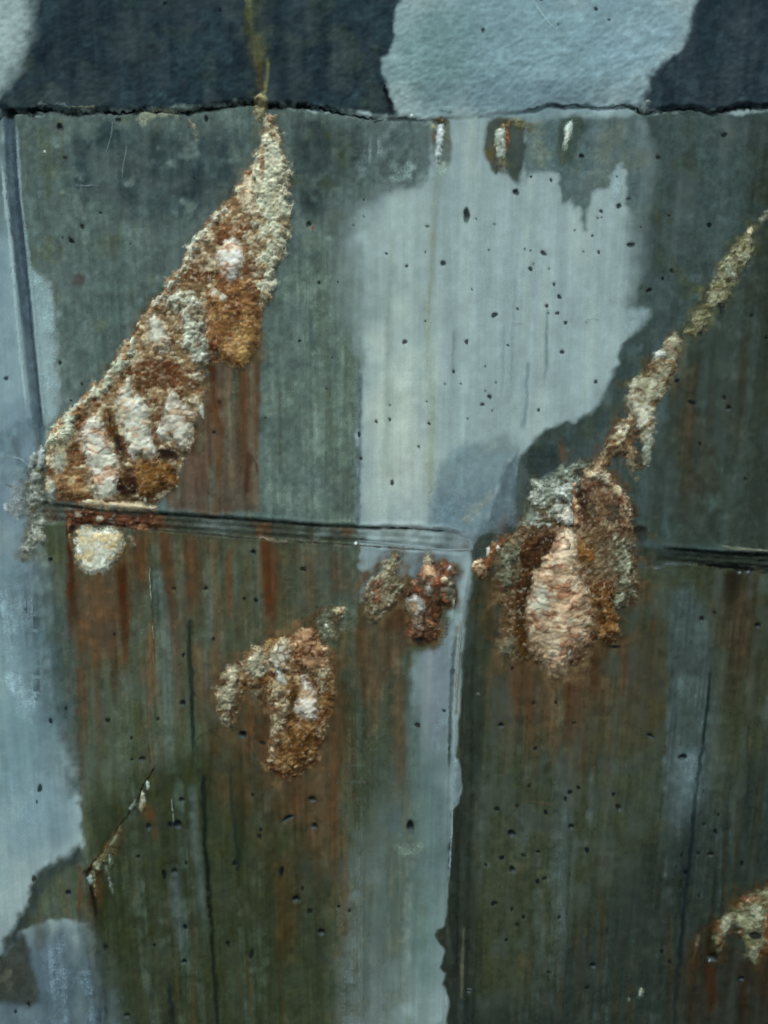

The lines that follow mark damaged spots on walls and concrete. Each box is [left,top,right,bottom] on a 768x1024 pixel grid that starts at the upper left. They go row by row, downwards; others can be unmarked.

crack [7,84,424,122]
crack [547,103,767,114]
rust [168,341,262,513]
rust [67,538,76,618]
rust [91,528,171,647]
water stain [0,0,461,1024]
water stain [431,0,768,1024]
crack [83,750,155,909]